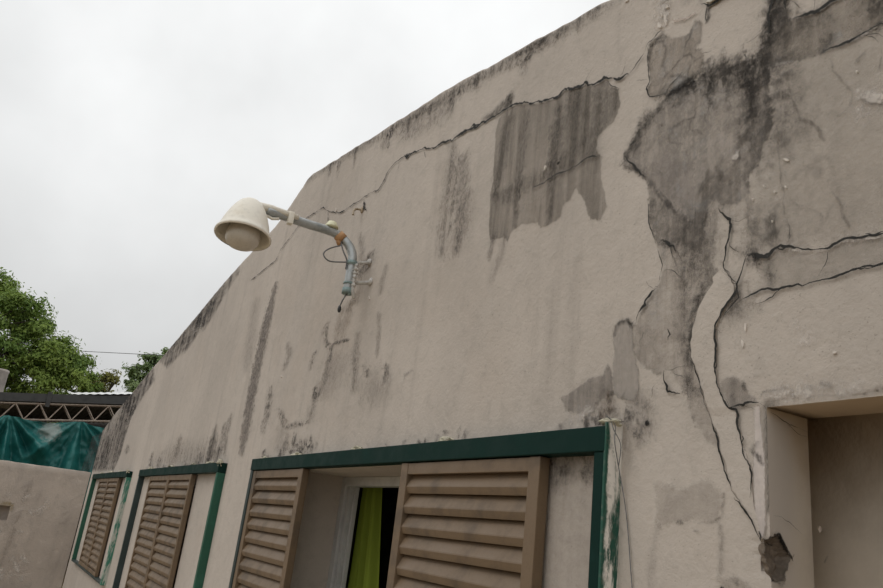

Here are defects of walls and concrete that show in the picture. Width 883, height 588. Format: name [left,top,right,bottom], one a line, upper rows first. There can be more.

crack [744,0,836,57]
crack [821,21,883,53]
damp [353,61,503,152]
crack [253,31,681,279]
damp [544,86,588,172]
crack [627,205,683,340]
damp [82,373,153,469]
damp [167,277,232,365]
damp [240,283,277,450]
crack [652,209,883,546]
flaking render [752,405,793,582]